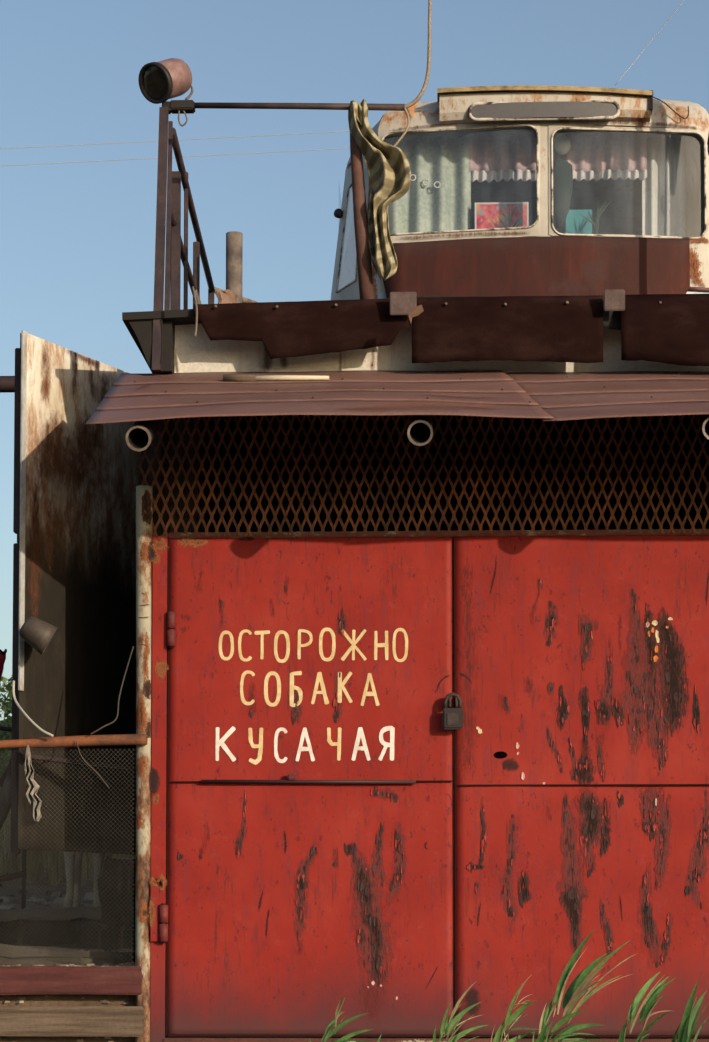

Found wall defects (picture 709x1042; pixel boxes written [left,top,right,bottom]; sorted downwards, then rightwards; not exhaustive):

corrosion [141,490,153,525]
peeling [333,822,409,988]
peeling [545,584,701,968]
peeling [685,773,709,910]